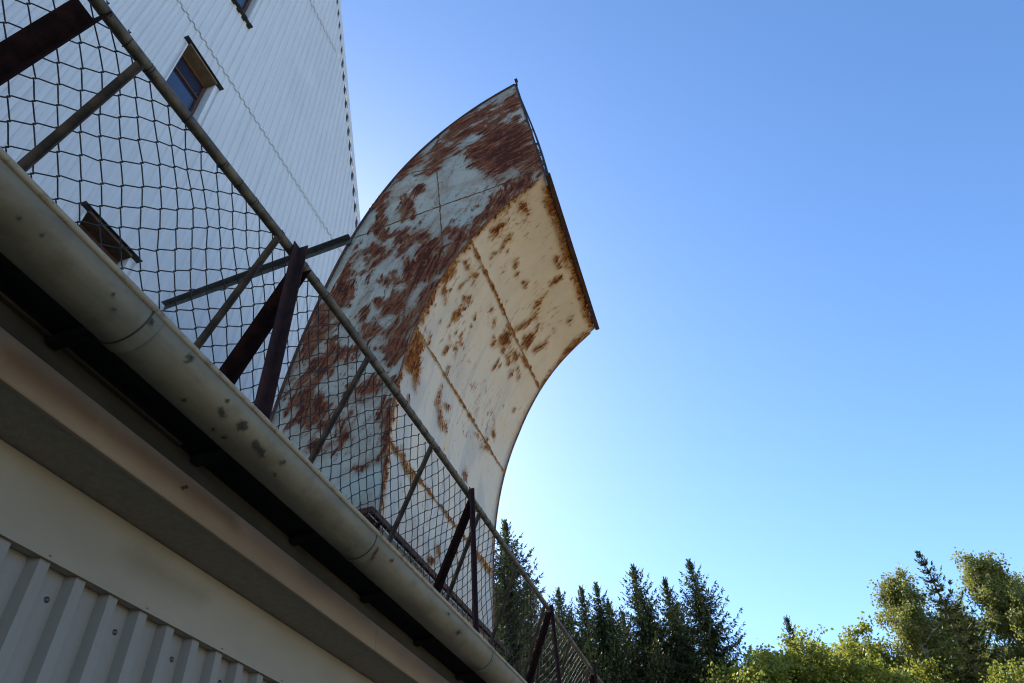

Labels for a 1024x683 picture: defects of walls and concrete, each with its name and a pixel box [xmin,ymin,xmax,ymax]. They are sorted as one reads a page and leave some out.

rust [280,88,594,540]